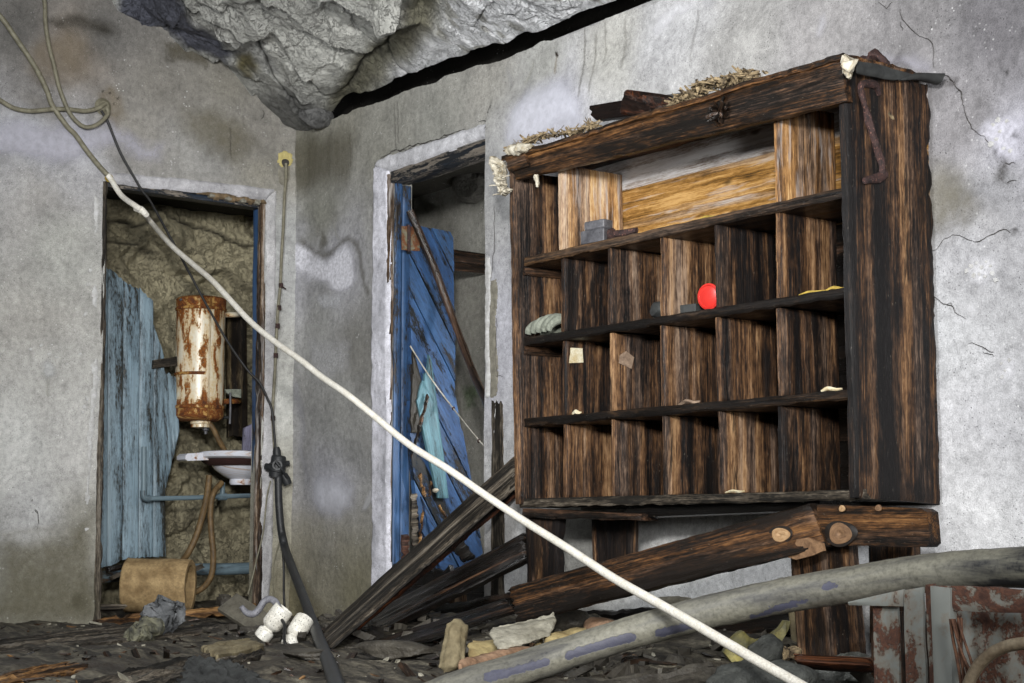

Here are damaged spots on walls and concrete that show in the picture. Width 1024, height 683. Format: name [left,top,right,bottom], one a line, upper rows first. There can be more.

crack [880,2,1014,165]